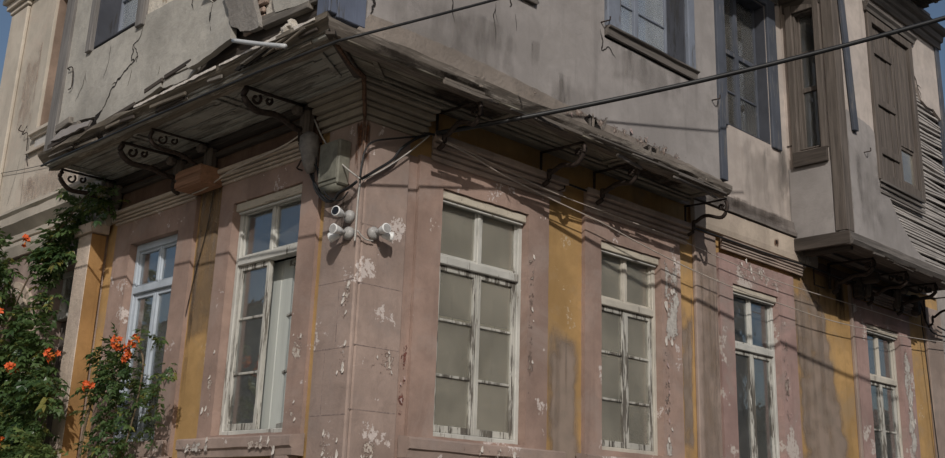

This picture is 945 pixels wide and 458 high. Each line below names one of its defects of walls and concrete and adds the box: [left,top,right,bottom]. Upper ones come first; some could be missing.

crack [75,29,143,124]
flaking render [106,0,318,119]
peeling [664,257,680,457]
damp [794,285,847,458]